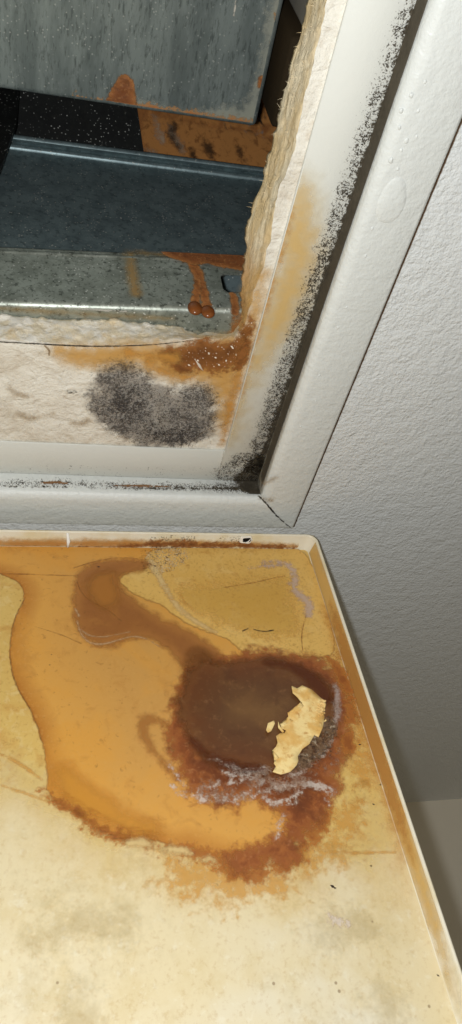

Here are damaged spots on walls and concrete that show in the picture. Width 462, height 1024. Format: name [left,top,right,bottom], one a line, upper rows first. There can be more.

rust [72,74,273,167]
rust [162,252,245,318]
leakage [55,0,428,494]
leakage [0,546,394,880]
peeling [266,685,326,775]